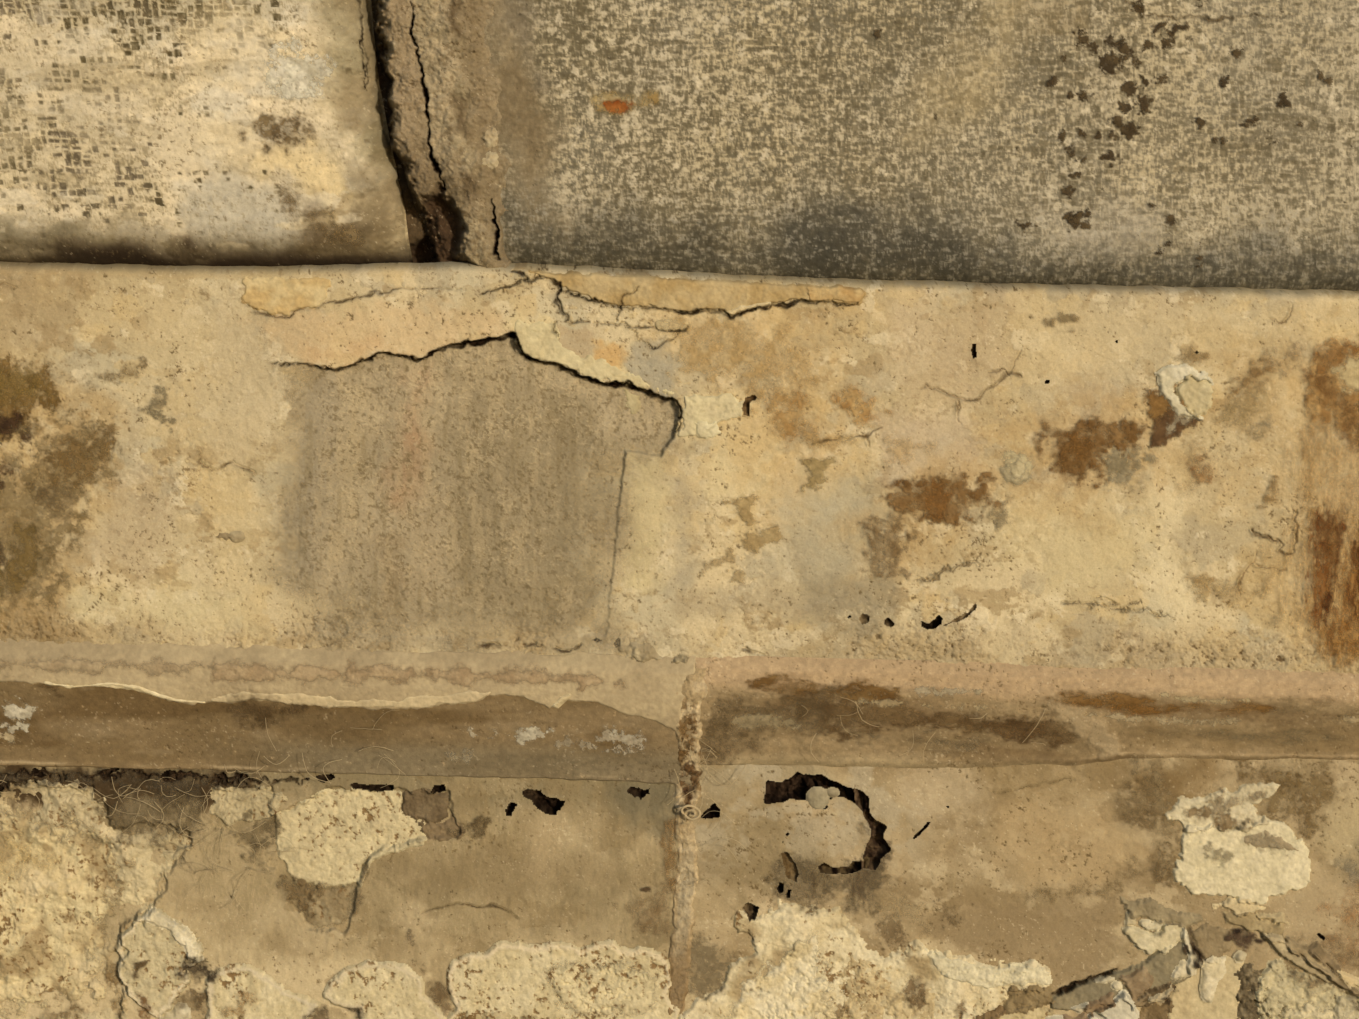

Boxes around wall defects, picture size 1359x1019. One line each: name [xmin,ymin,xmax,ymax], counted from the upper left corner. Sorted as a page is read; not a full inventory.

crack [359,1,369,86]
crack [409,14,446,190]
rust [591,92,659,114]
peeling [528,269,866,331]
rust [1305,338,1359,446]
damp [0,354,120,608]
spalling [283,319,757,627]
rust [1302,501,1359,669]
damp [0,698,36,743]
damp [701,674,1075,764]
peeling [1165,782,1299,851]
spalling [0,776,1053,1019]